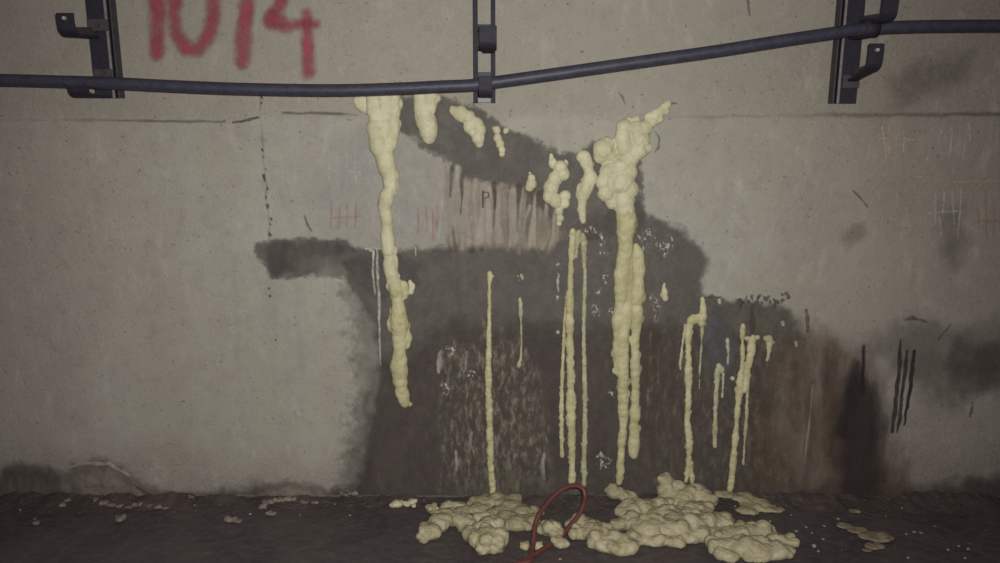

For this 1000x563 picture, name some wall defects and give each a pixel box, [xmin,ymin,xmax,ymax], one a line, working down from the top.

water stain [255,97,903,496]
water stain [891,340,916,433]